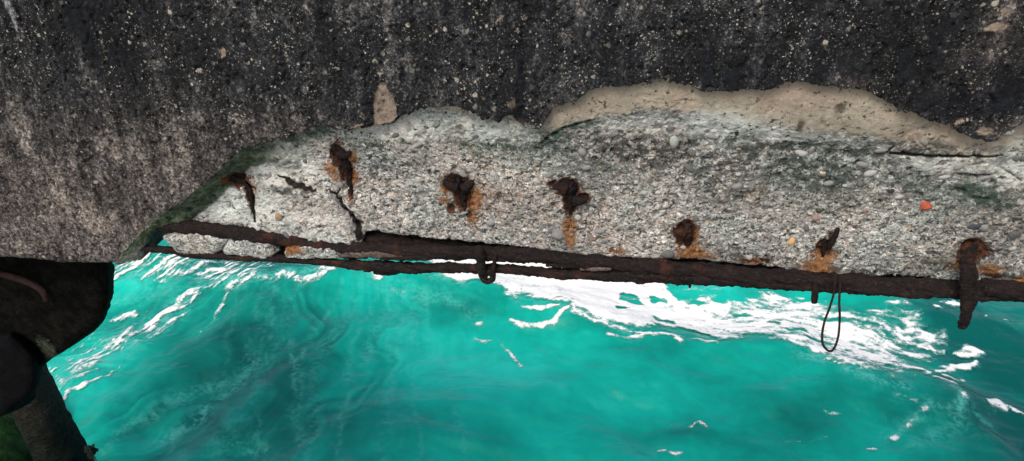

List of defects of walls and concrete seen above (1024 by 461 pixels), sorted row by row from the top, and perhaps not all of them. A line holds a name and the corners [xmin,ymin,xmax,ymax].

corrosion [220,172,257,206]
crack [277,175,365,241]
corrosion [324,141,359,202]
corrosion [439,174,484,224]
spalling [115,79,1024,281]
corrosion [547,176,593,249]
corrosion [274,245,302,256]
corrosion [335,251,446,276]
corrosion [669,217,714,259]
corrosion [799,233,837,273]
corrosion [951,238,1024,282]